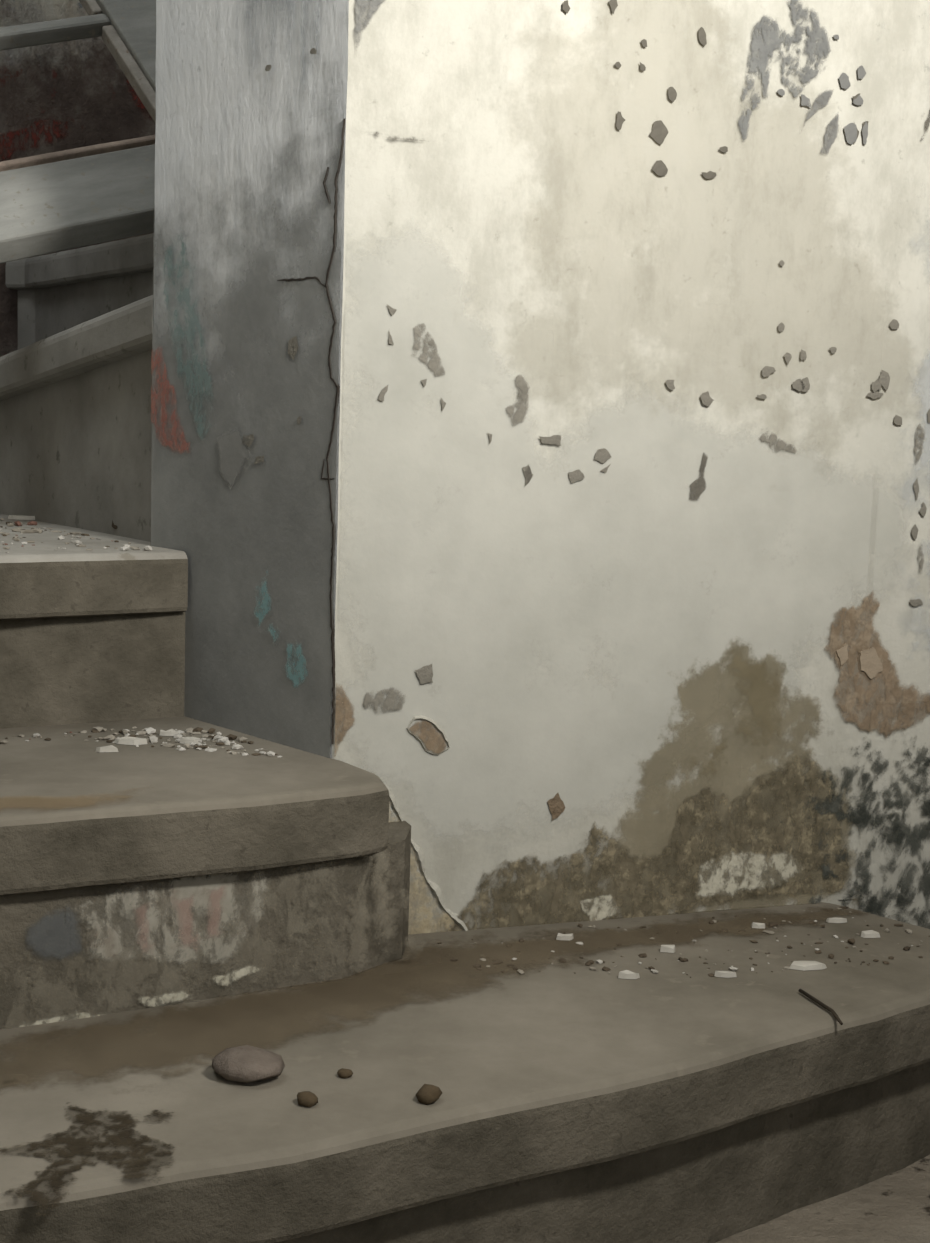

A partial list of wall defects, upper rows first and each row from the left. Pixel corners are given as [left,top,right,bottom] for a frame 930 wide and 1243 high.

peeling [698,27,707,46]
peeling [738,0,868,153]
peeling [668,87,677,102]
peeling [616,112,625,130]
peeling [650,120,668,145]
peeling [652,160,668,176]
crack [277,118,346,744]
peeling [334,239,930,835]
flaking render [408,756,850,940]
damp [0,646,930,1088]
flaking render [861,930,880,938]